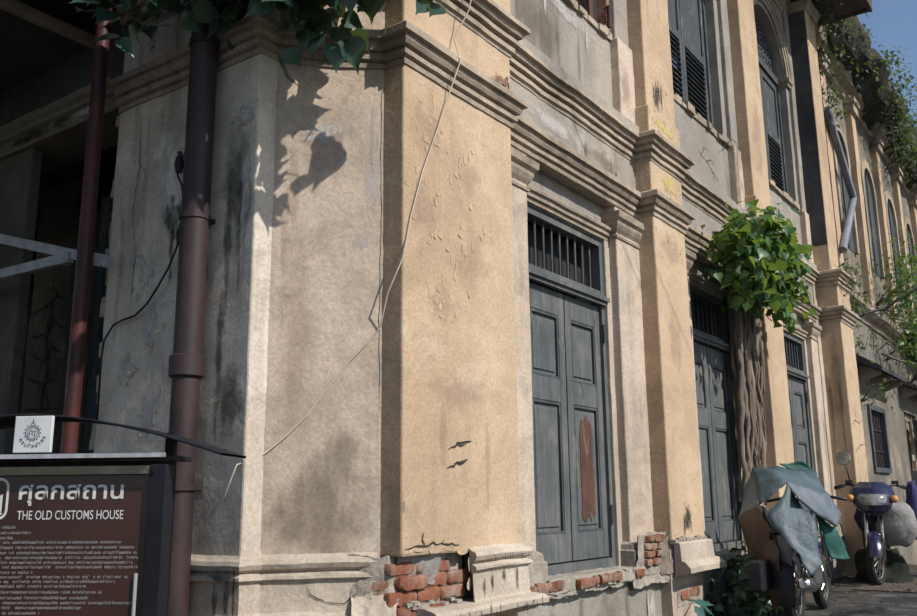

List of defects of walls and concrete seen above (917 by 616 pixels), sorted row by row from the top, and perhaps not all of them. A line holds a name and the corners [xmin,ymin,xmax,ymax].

crack [129,115,148,306]
leakage [165,198,181,279]
leakage [215,148,250,424]
crack [306,586,356,604]
flaking render [347,546,472,616]
flaking render [530,531,707,607]